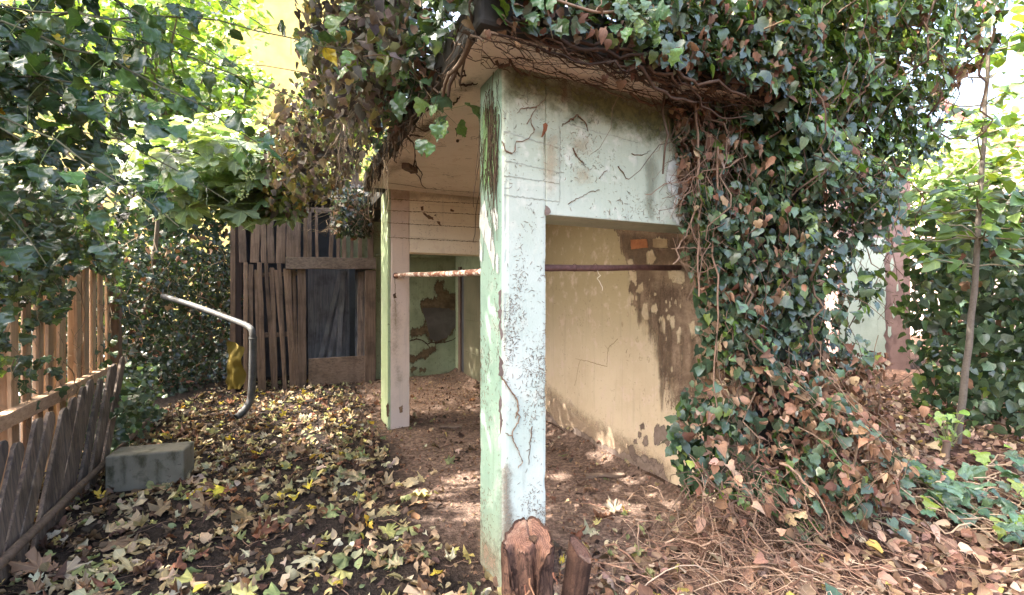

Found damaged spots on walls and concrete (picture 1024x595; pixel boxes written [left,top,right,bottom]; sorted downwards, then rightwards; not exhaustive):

damp [482,111,497,190]
crack [504,120,638,202]
spalling [409,279,456,374]
peeling [545,157,723,481]
damp [638,294,717,406]